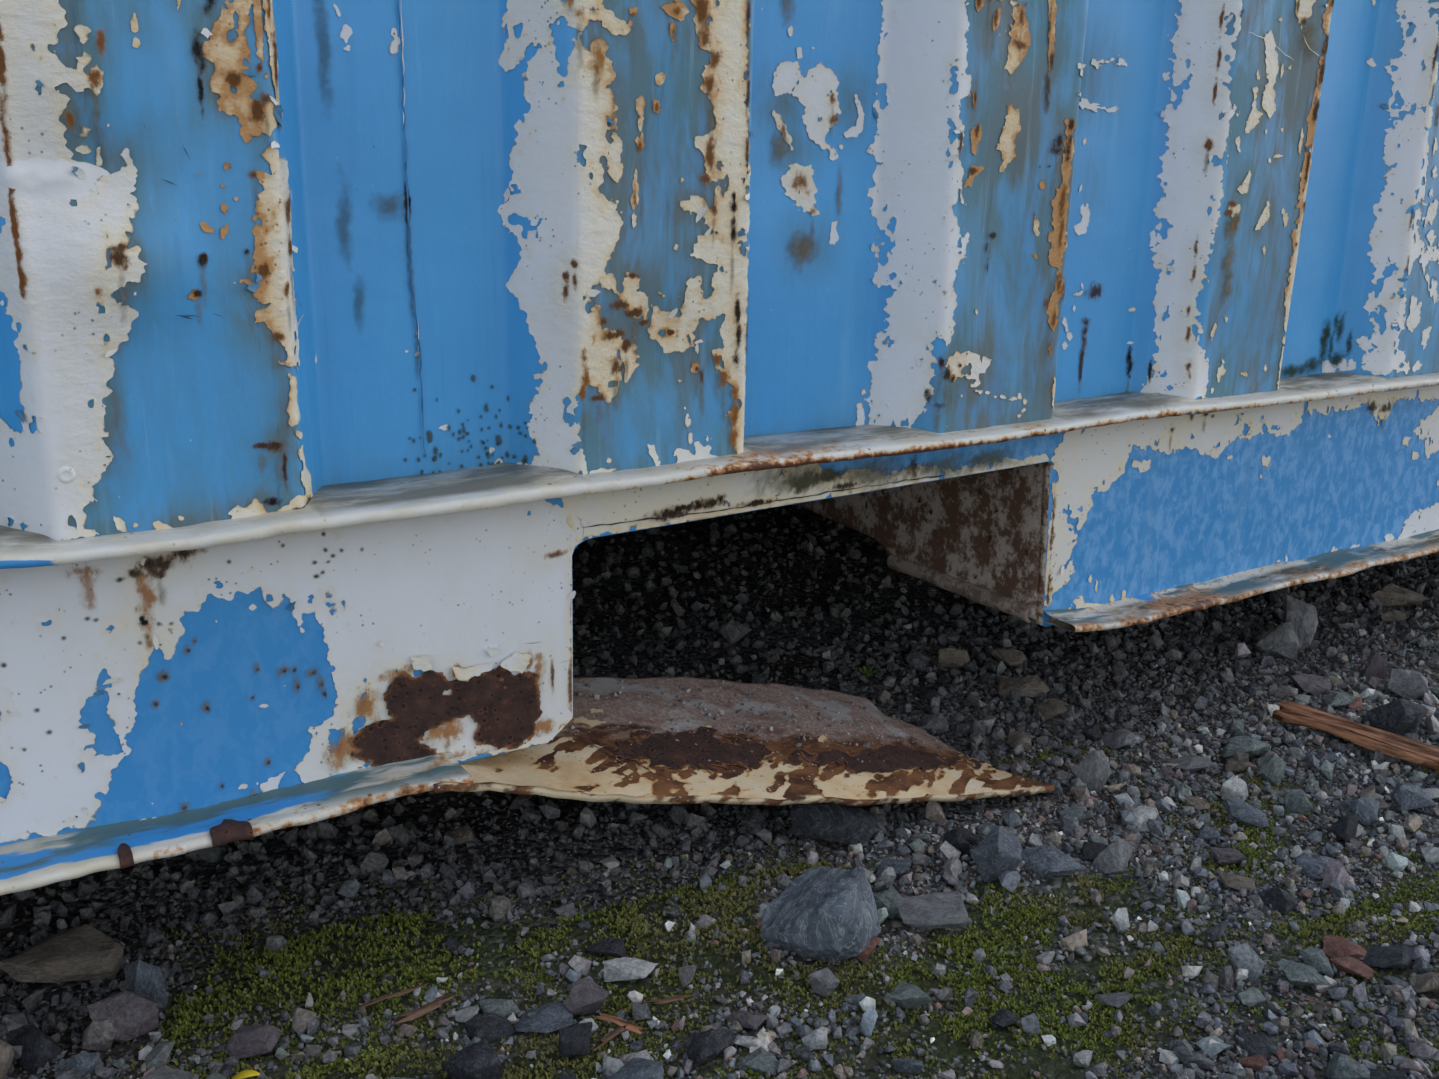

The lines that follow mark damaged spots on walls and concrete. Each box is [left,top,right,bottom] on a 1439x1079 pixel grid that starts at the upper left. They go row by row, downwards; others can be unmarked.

rust [192,34,205,112]
rust [225,71,241,87]
rust [249,0,282,129]
rust [1313,36,1329,122]
rust [1039,119,1075,168]
rust [257,262,269,279]
rust [1045,273,1065,350]
rust [1127,346,1152,381]
peeling [0,0,1439,843]
rust [1047,500,1056,604]
rust [326,648,572,769]
rust [590,726,986,777]